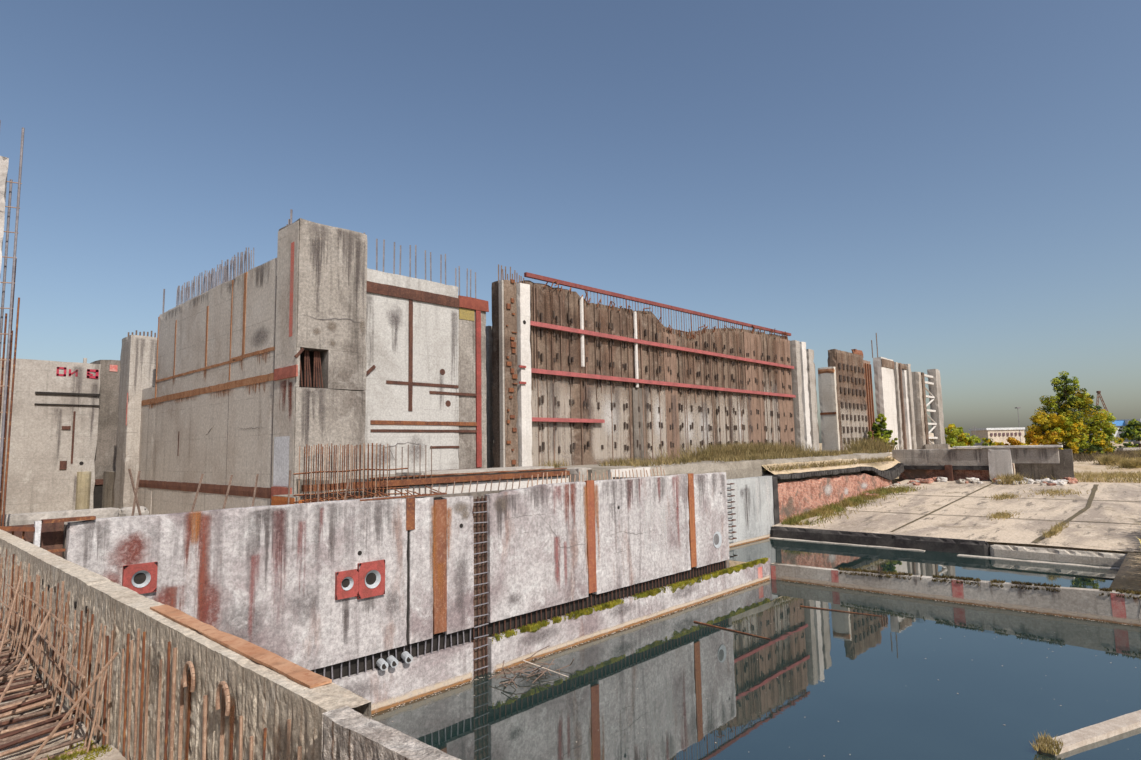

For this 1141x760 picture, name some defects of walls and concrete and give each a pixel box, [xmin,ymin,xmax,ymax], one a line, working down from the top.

corrosion [556,484,599,545]
corrosion [117,539,144,565]
corrosion [186,512,219,625]
corrosion [555,537,567,584]
corrosion [157,587,181,608]